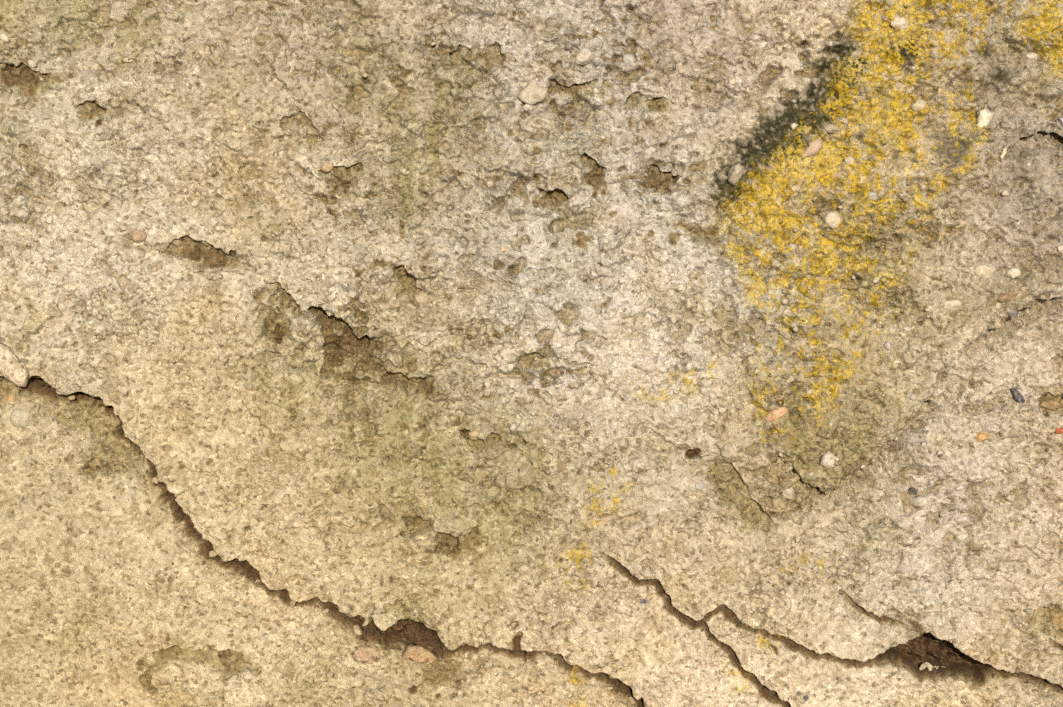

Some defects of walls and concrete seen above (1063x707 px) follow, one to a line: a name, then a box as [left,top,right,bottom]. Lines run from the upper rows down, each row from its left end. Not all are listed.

crack [0,373,705,707]
crack [591,538,883,707]
crack [832,583,931,637]
crack [982,632,1063,697]